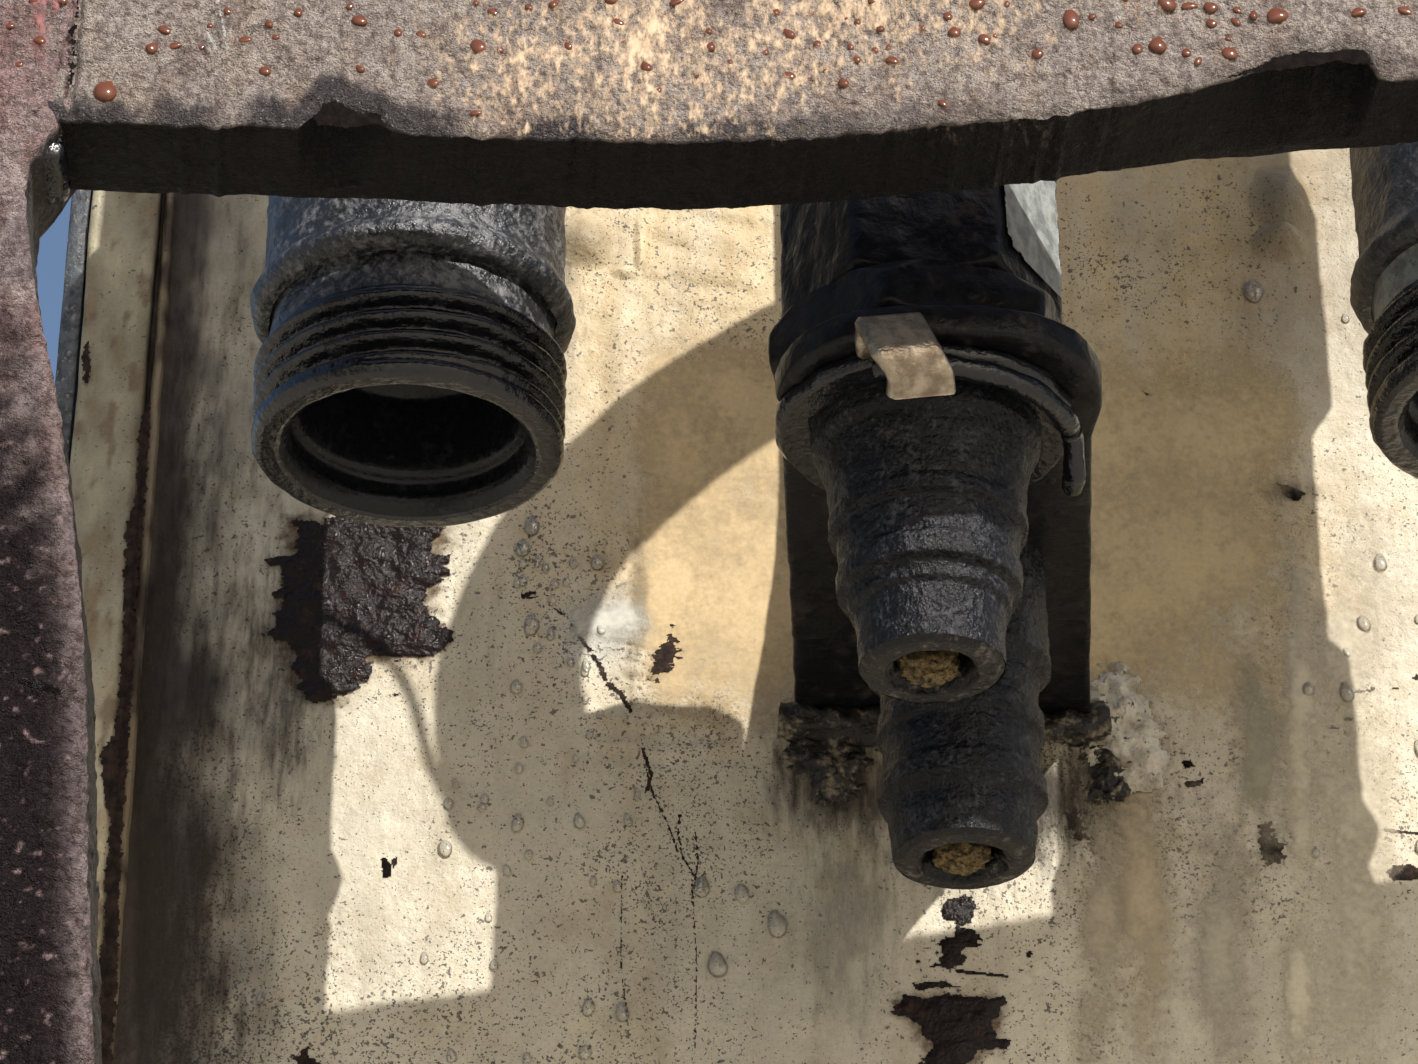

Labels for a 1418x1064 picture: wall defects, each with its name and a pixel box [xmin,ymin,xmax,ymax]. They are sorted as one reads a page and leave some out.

crack [67,0,80,104]
corrosion [437,0,1018,137]
crack [620,875,629,1024]
crack [641,747,699,1048]